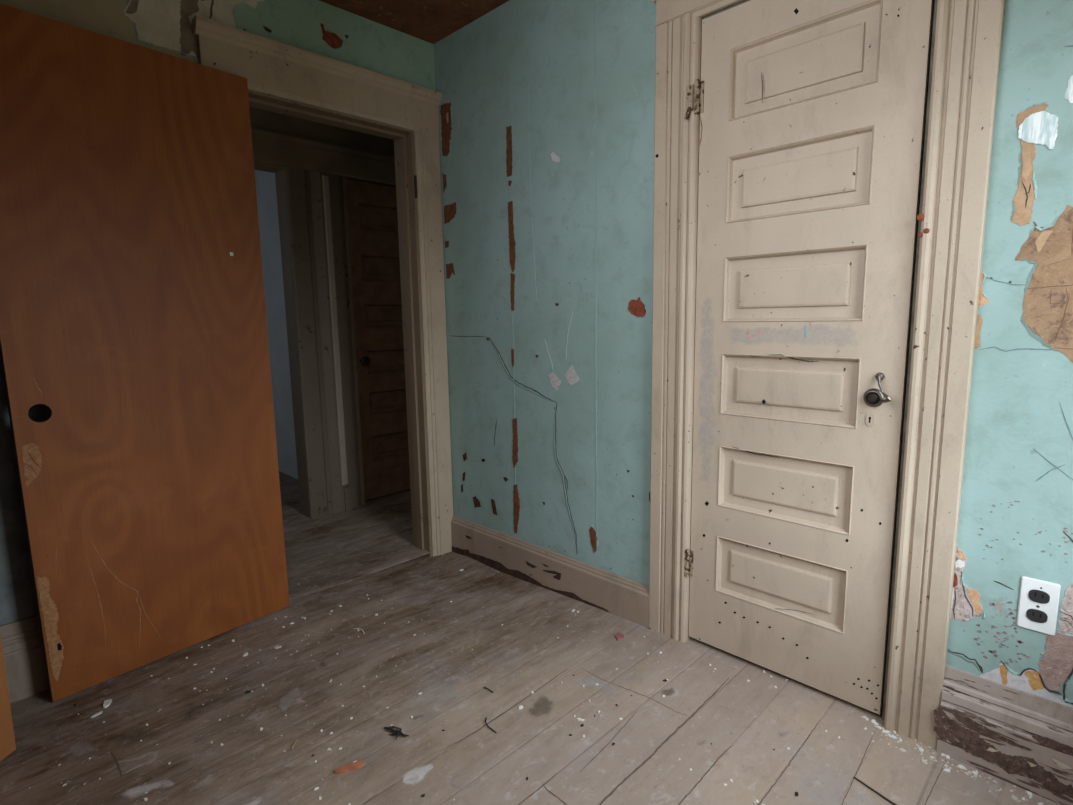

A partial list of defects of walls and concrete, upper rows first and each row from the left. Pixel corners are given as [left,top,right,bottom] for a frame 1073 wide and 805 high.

flaking render [123,0,265,62]
peeling [440,102,453,157]
peeling [1017,102,1048,199]
peeling [443,174,456,224]
peeling [446,263,455,279]
peeling [503,16,520,534]
peeling [627,296,647,319]
flaking render [1015,205,1073,363]
crack [457,336,577,553]
peeling [452,535,610,613]
flaking render [950,542,1073,708]
peeling [933,707,1073,798]